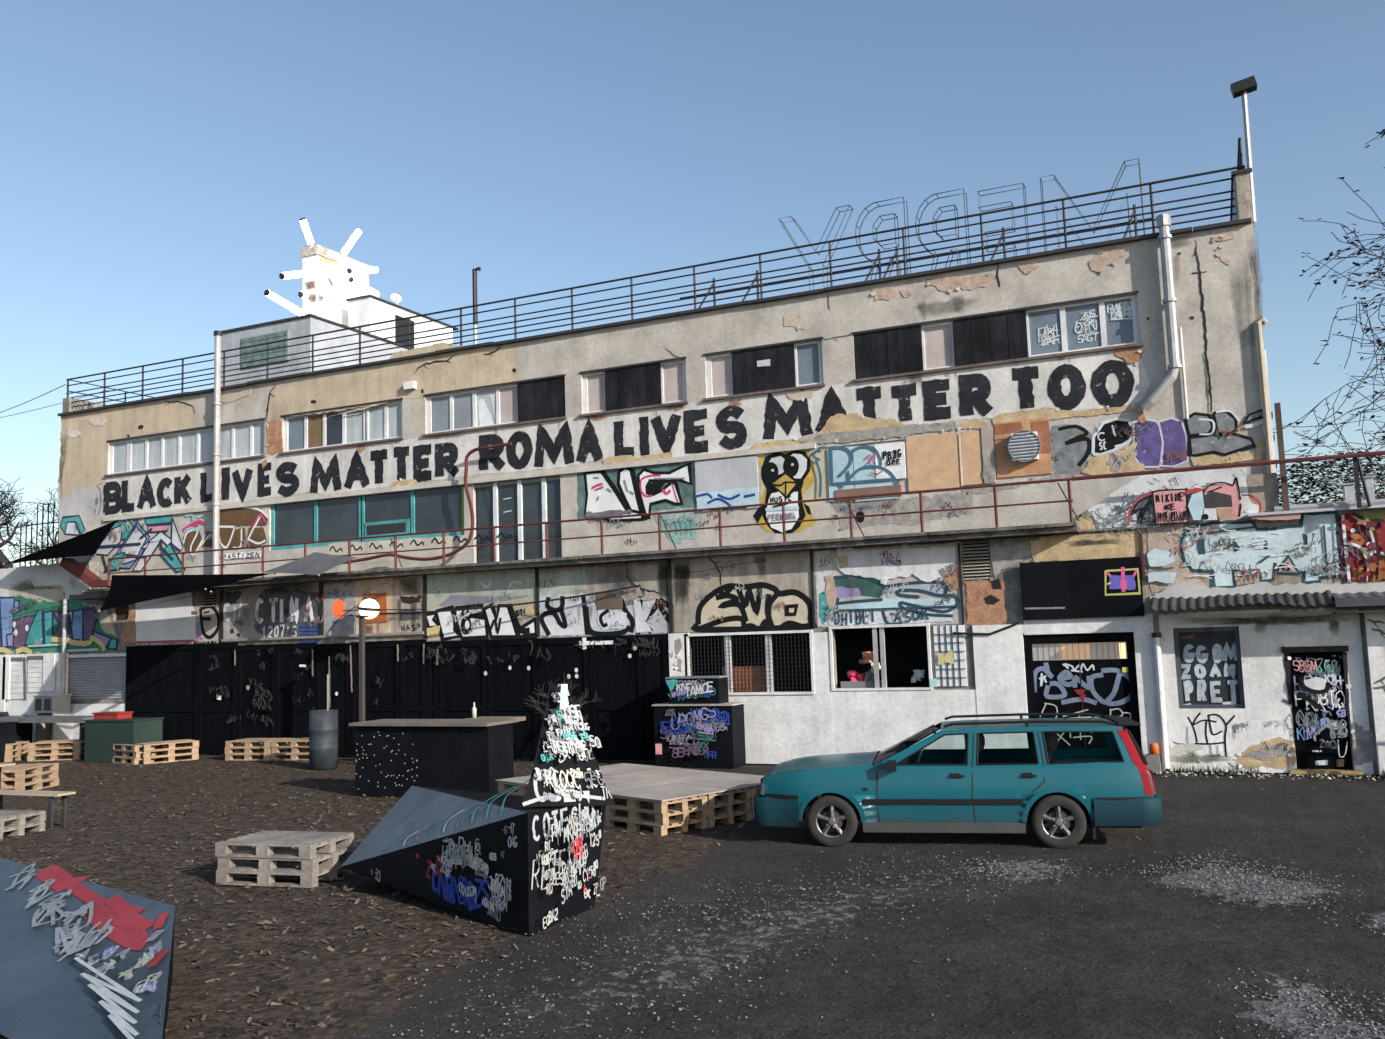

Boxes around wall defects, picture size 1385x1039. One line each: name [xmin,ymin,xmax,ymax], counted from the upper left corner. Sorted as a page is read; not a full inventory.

peeling [1089,248,1126,274]